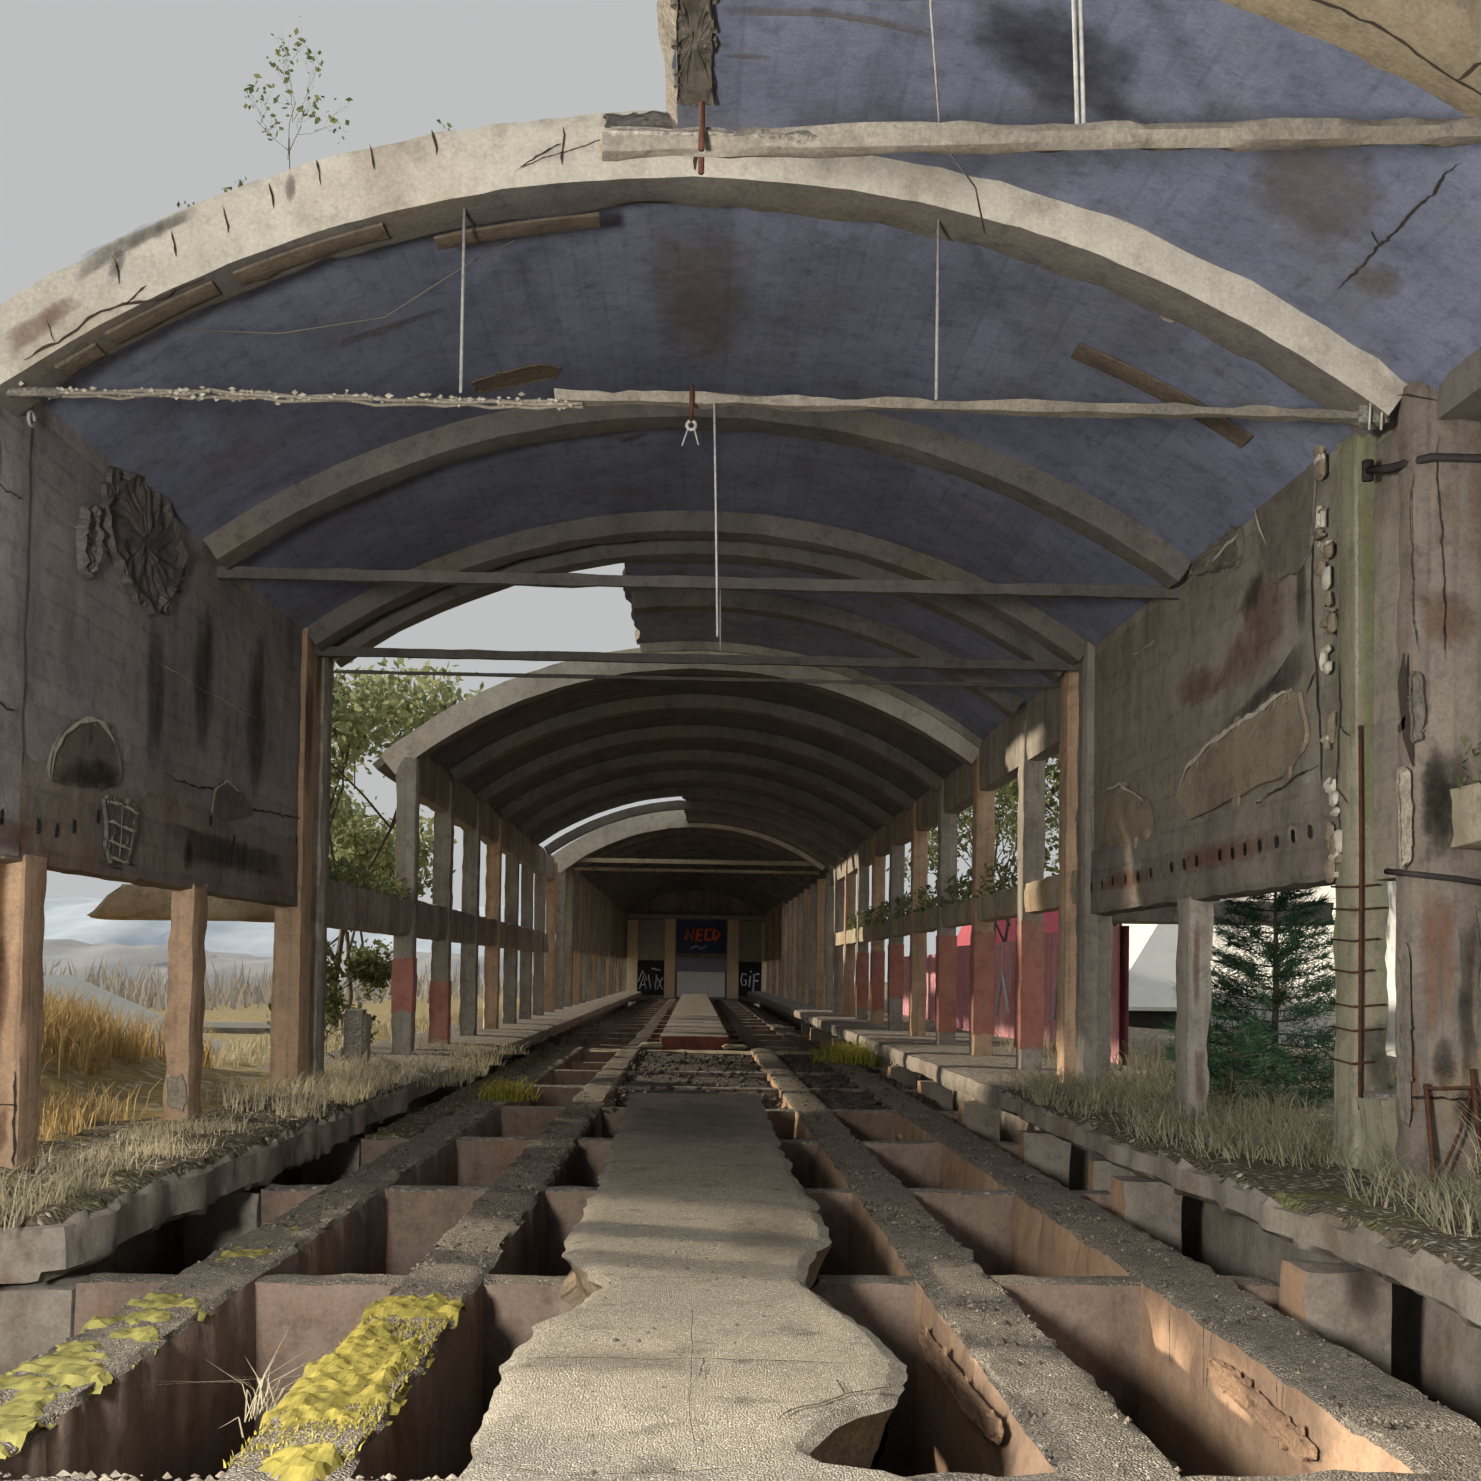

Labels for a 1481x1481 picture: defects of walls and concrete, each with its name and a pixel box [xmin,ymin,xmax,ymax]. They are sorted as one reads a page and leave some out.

spalling [602,0,718,129]
crack [1312,0,1481,95]
crack [1338,163,1462,289]
crack [24,231,202,360]
leakage [1427,767,1467,833]
crack [477,1277,750,1476]
crack [772,1360,902,1419]